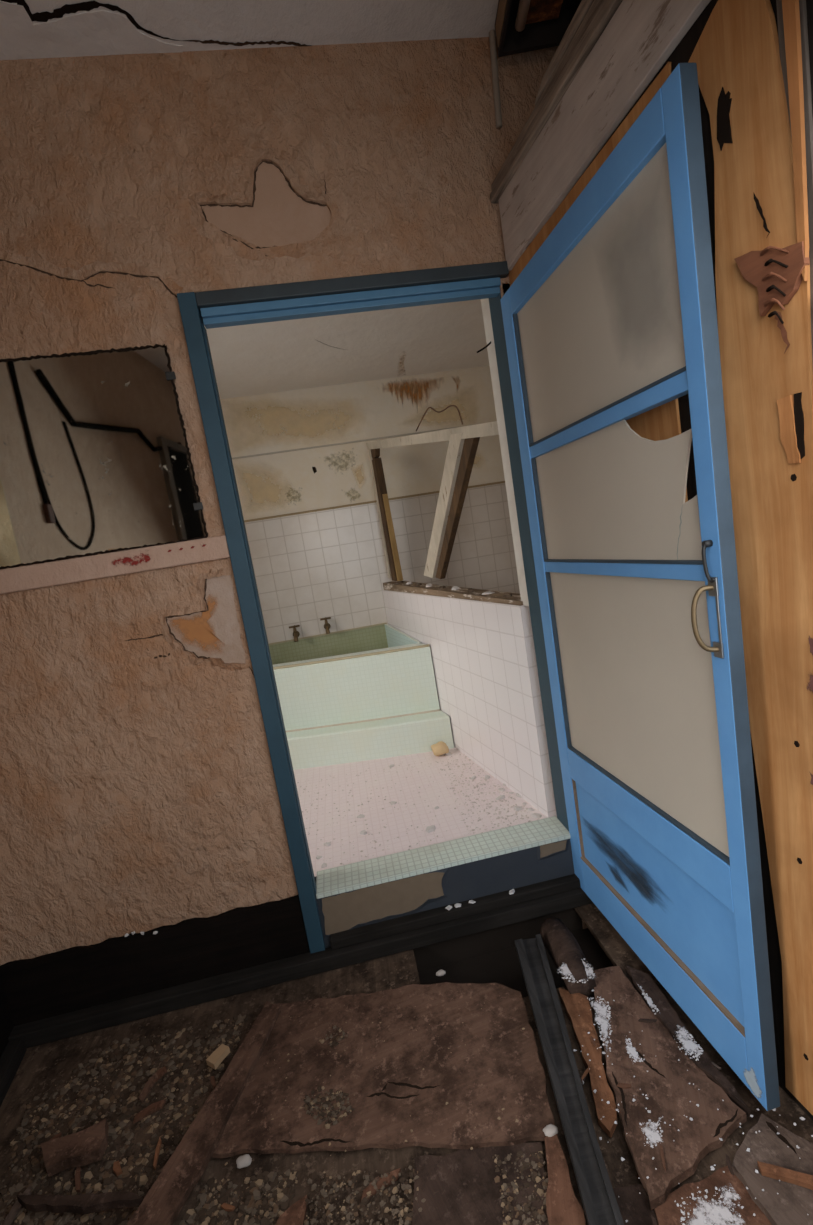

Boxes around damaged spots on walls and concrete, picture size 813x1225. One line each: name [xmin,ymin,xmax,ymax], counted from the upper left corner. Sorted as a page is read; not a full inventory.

crack [0,0,311,54]
crack [0,250,183,298]
spalling [126,568,254,675]